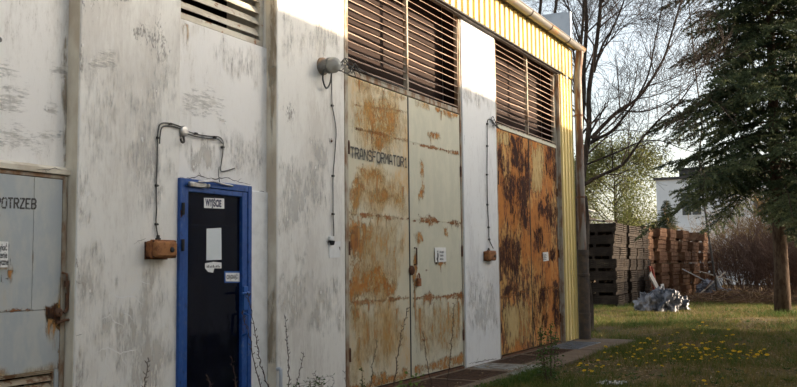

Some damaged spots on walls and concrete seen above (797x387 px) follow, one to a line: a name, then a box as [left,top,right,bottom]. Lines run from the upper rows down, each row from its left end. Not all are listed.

rust [44,299,60,336]
rust [349,168,463,387]
rust [497,132,560,349]